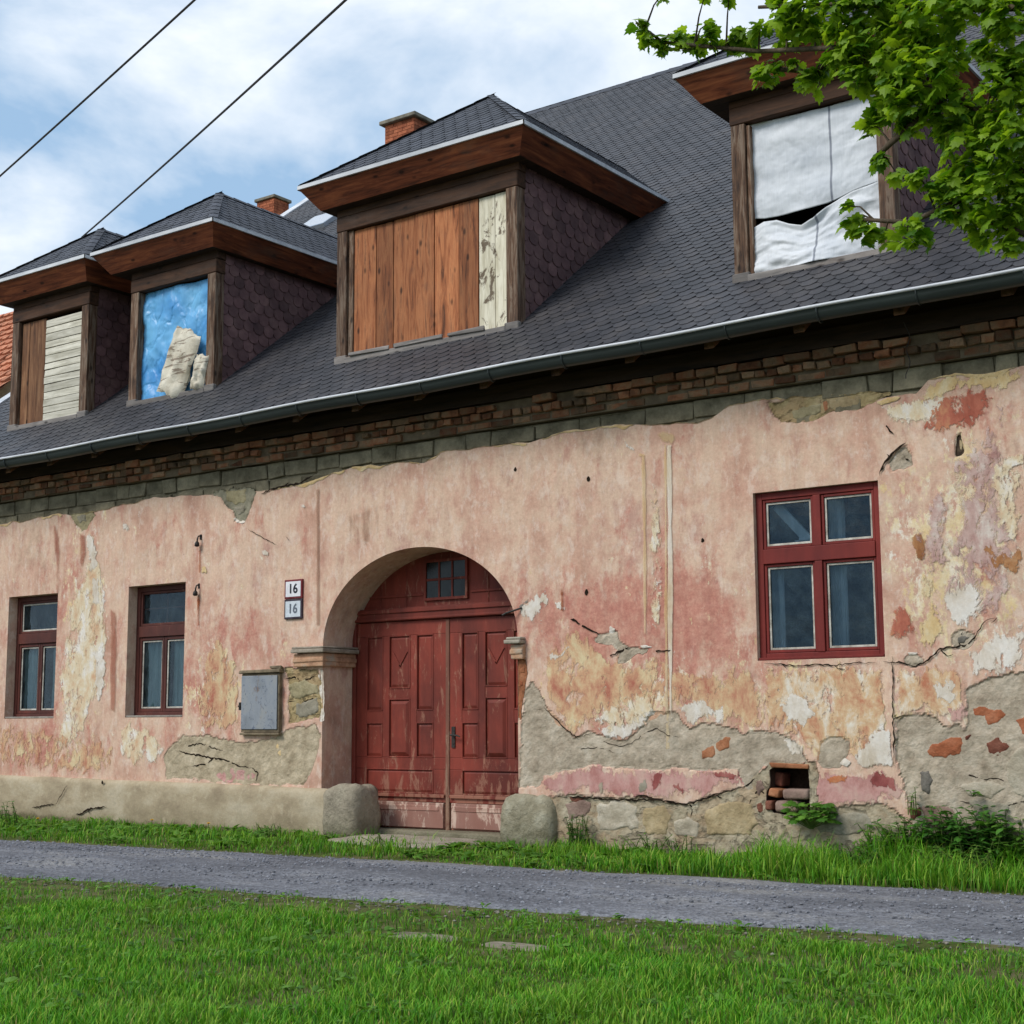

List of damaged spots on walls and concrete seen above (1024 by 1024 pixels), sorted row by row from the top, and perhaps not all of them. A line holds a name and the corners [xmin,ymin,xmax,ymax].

spalling [0,352,1024,860]
crack [570,618,628,656]
crack [765,618,997,763]
crack [180,743,258,780]
crack [32,788,106,815]